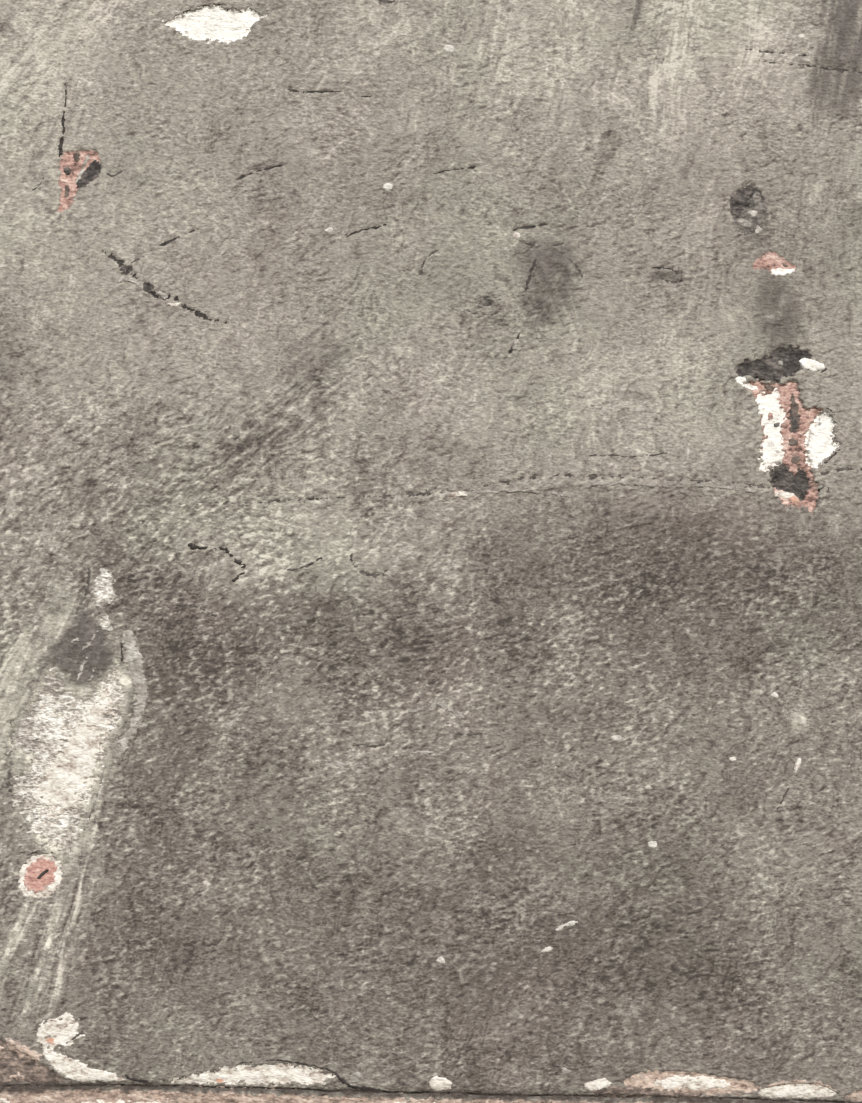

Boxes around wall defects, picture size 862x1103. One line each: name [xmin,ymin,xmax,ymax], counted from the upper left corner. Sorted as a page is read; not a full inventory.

spalling [162,3,267,44]
crack [745,49,862,74]
damp [812,0,862,106]
crack [102,229,227,326]
spalling [734,345,841,514]
crack [198,452,770,505]
crack [820,467,862,476]
rust [18,849,65,899]
damp [0,901,29,973]
damp [33,905,61,980]
spalling [0,1013,153,1086]
spalling [171,1059,383,1093]